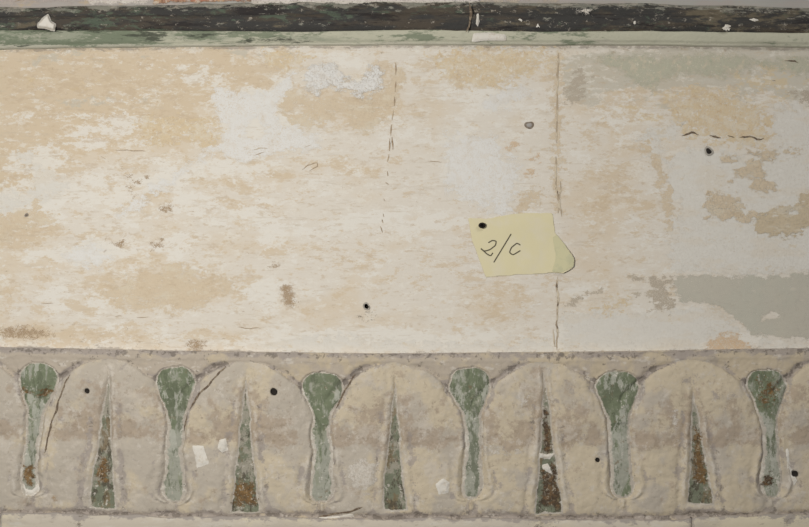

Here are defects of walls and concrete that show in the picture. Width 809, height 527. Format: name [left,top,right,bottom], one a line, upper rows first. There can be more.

crack [380,63,397,231]
peeling [513,50,594,215]
peeling [263,272,809,353]